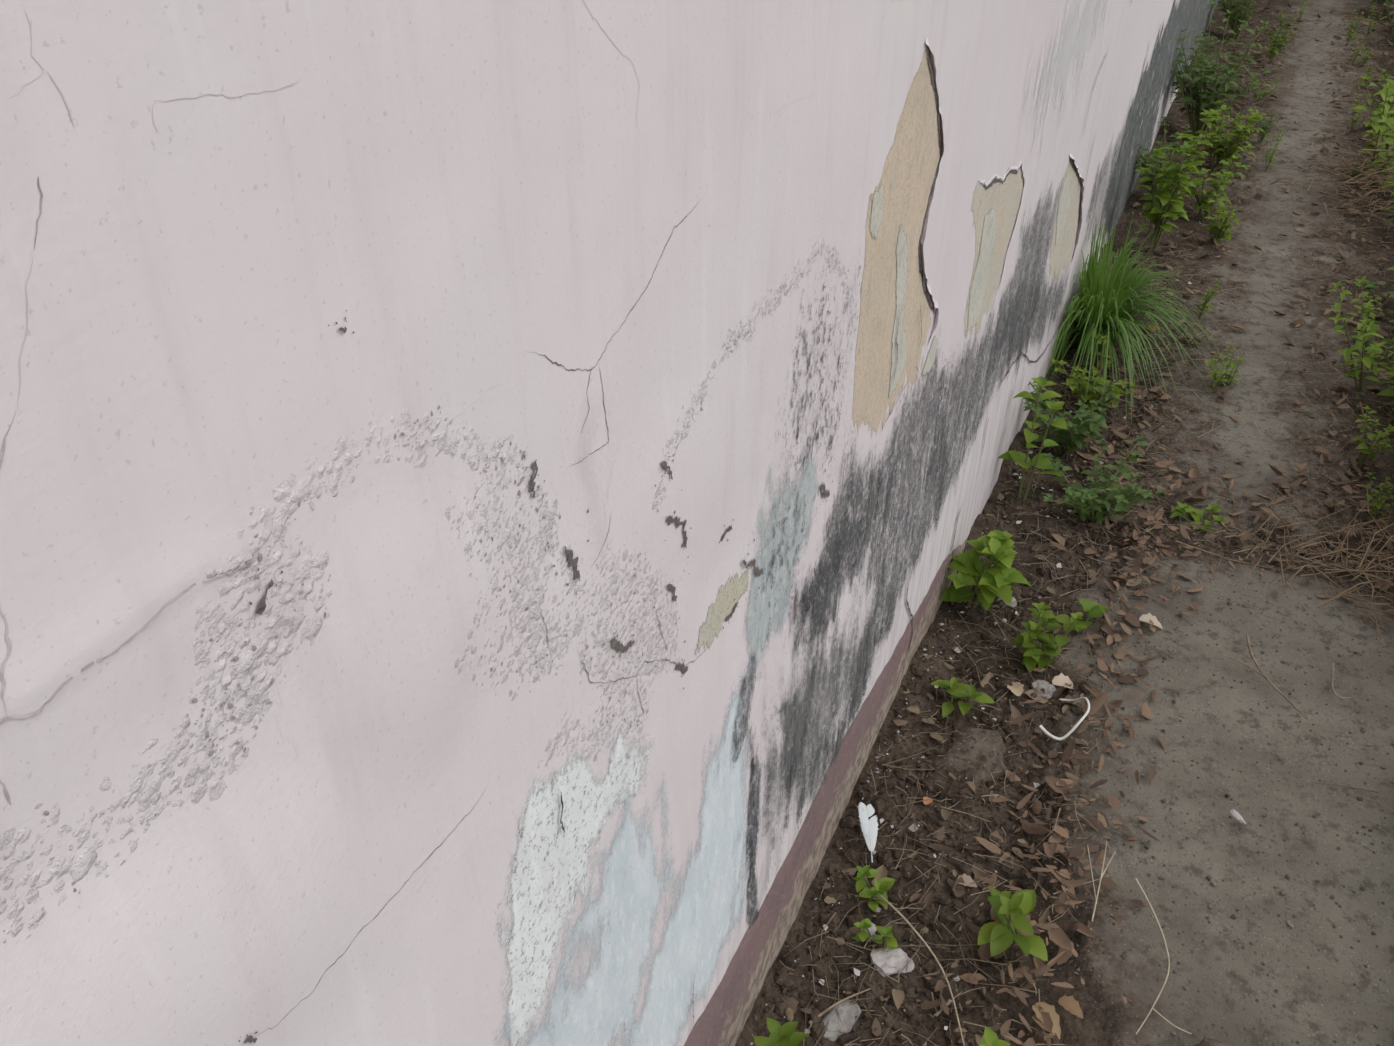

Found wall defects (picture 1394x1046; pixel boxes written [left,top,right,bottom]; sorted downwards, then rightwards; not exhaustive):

crack [152,78,302,131]
crack [583,1,646,145]
crack [0,177,43,470]
crack [535,203,698,468]
peeling [852,38,944,438]
peeling [964,160,1025,338]
peeling [1049,154,1085,284]
crack [0,532,273,725]
peeling [675,539,764,689]
leakage [733,179,1069,925]
crack [0,780,11,805]
peeling [497,733,652,1046]